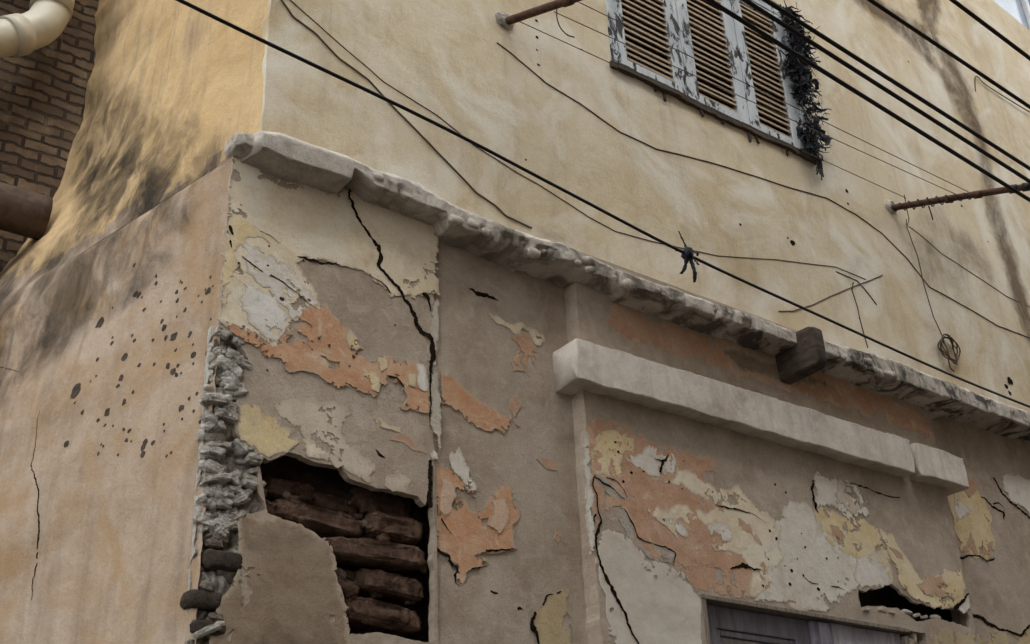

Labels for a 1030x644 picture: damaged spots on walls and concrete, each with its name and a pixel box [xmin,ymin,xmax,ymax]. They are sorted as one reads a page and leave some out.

crack [348,188,436,427]
peeling [488,313,546,376]
spalling [70,375,97,415]
spalling [96,374,165,458]
peeling [137,156,520,644]
crack [592,475,676,644]
peeling [581,412,970,614]
peeling [947,475,995,561]
peeling [1001,474,1030,516]